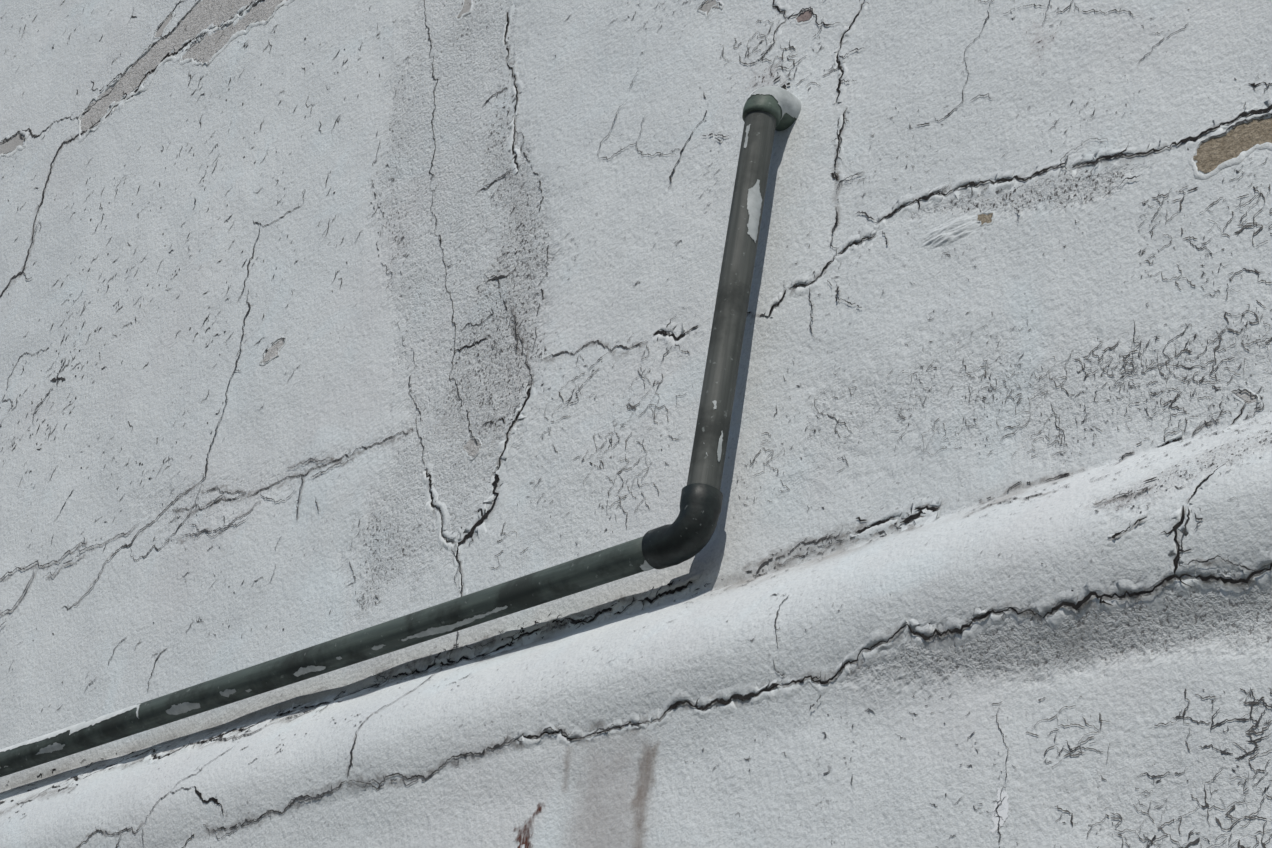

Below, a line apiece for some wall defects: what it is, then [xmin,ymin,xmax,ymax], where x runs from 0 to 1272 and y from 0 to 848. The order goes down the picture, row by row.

peeling [75,0,294,211]
peeling [1188,112,1272,212]
peeling [0,165,201,450]
crack [720,0,1272,509]
peeling [1139,191,1178,283]
peeling [774,361,932,447]
peeling [947,312,1032,453]
crack [0,463,1272,848]
rust [514,804,542,848]